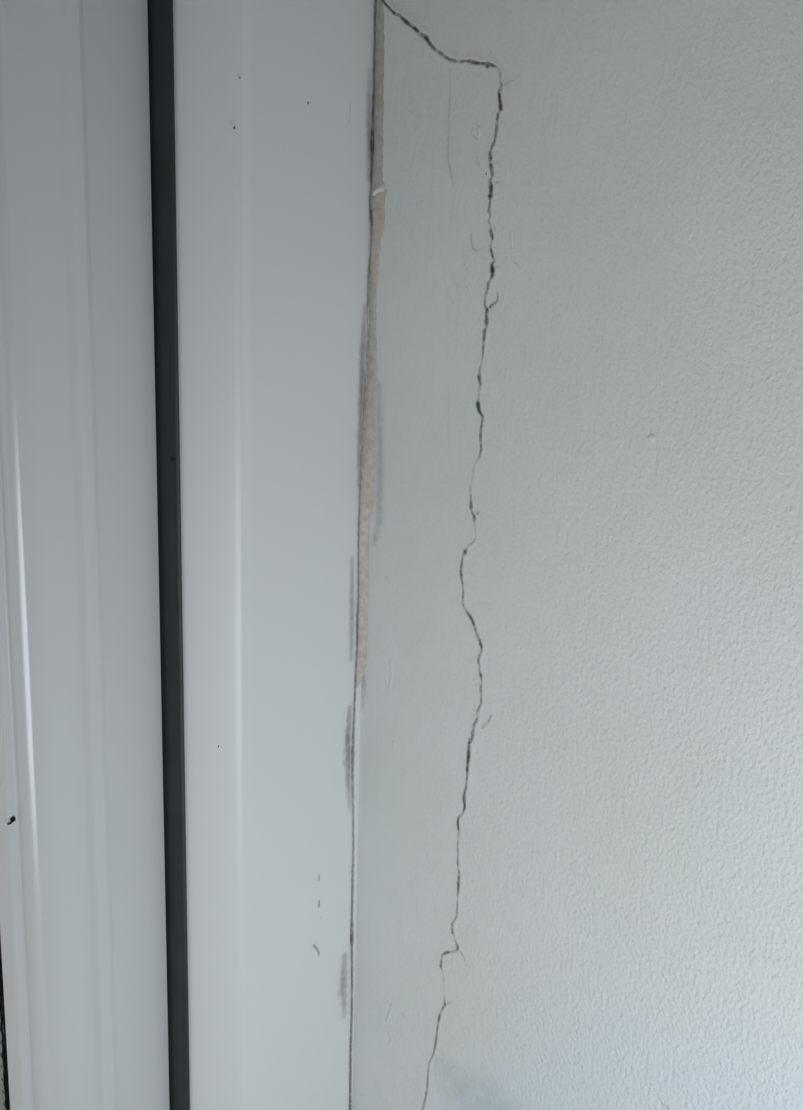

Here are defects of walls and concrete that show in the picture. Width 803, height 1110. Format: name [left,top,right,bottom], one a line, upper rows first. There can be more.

crack [368,95,376,174]
crack [375,0,511,1110]
crack [347,880,355,1110]